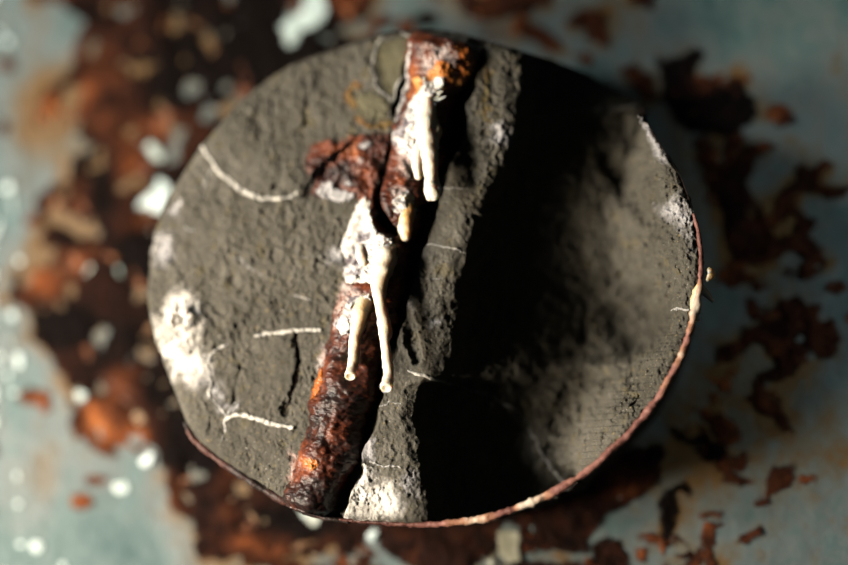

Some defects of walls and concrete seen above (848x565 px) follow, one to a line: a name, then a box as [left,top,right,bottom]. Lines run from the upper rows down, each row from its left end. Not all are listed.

crack [364,32,410,114]
crack [200,145,298,201]
crack [374,134,399,237]
water stain [389,42,459,219]
rust [5,0,667,565]
water stain [330,196,394,336]
rust [621,48,848,487]
crack [206,328,322,438]
rust [635,481,722,565]
rust [753,464,814,507]